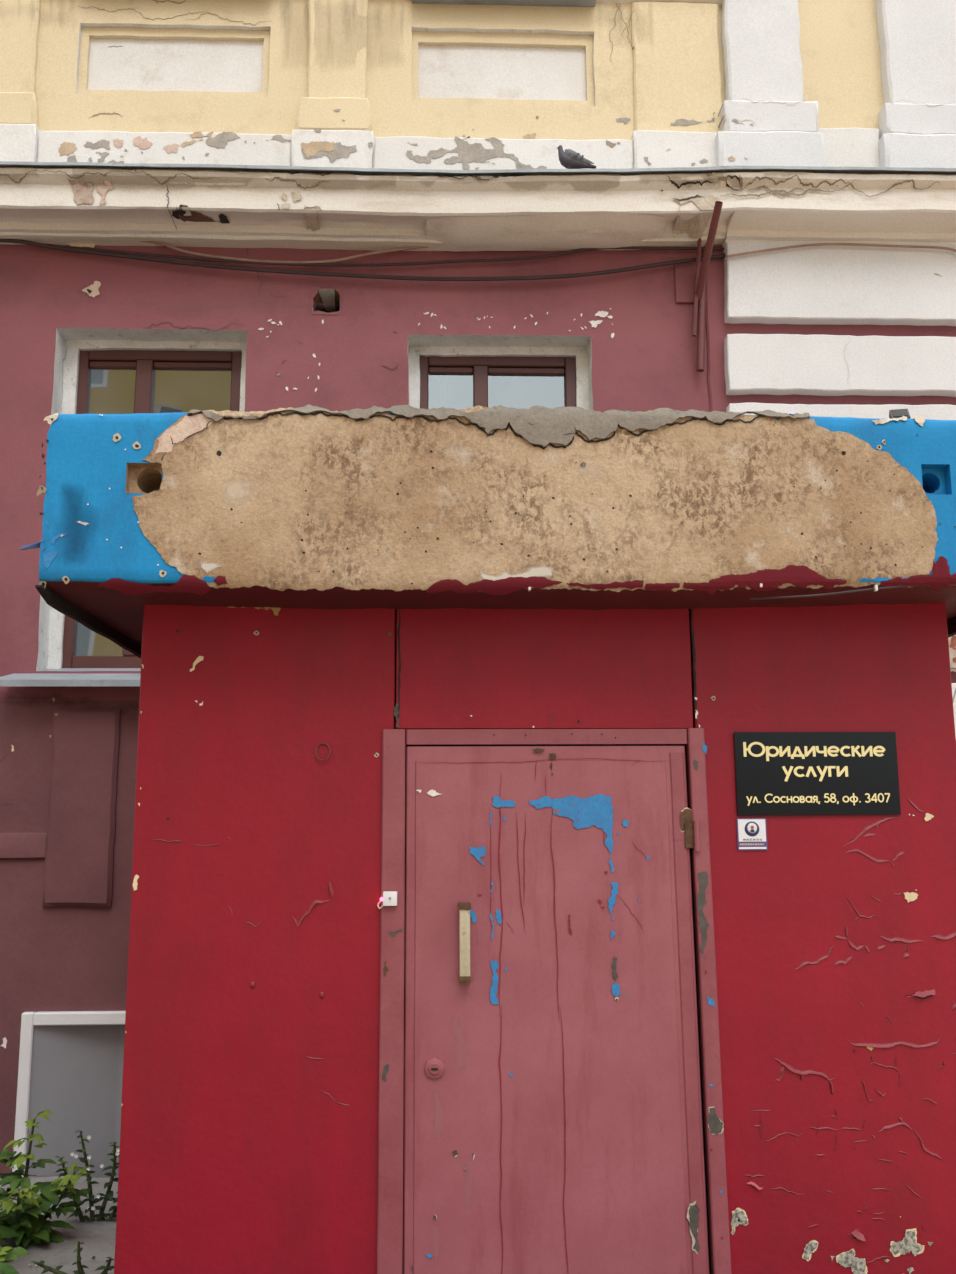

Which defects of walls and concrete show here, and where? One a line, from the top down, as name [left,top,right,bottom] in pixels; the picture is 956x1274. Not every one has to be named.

peeling [58,131,256,170]
peeling [271,128,373,176]
peeling [406,129,547,180]
crack [661,174,941,201]
spalling [172,204,229,224]
peeling [112,405,956,592]
flaking render [948,635,956,672]
peeling [489,794,629,939]
crack [794,798,956,970]
crack [743,1003,956,1264]
flaking render [831,1229,868,1274]
flaking render [884,1216,933,1274]